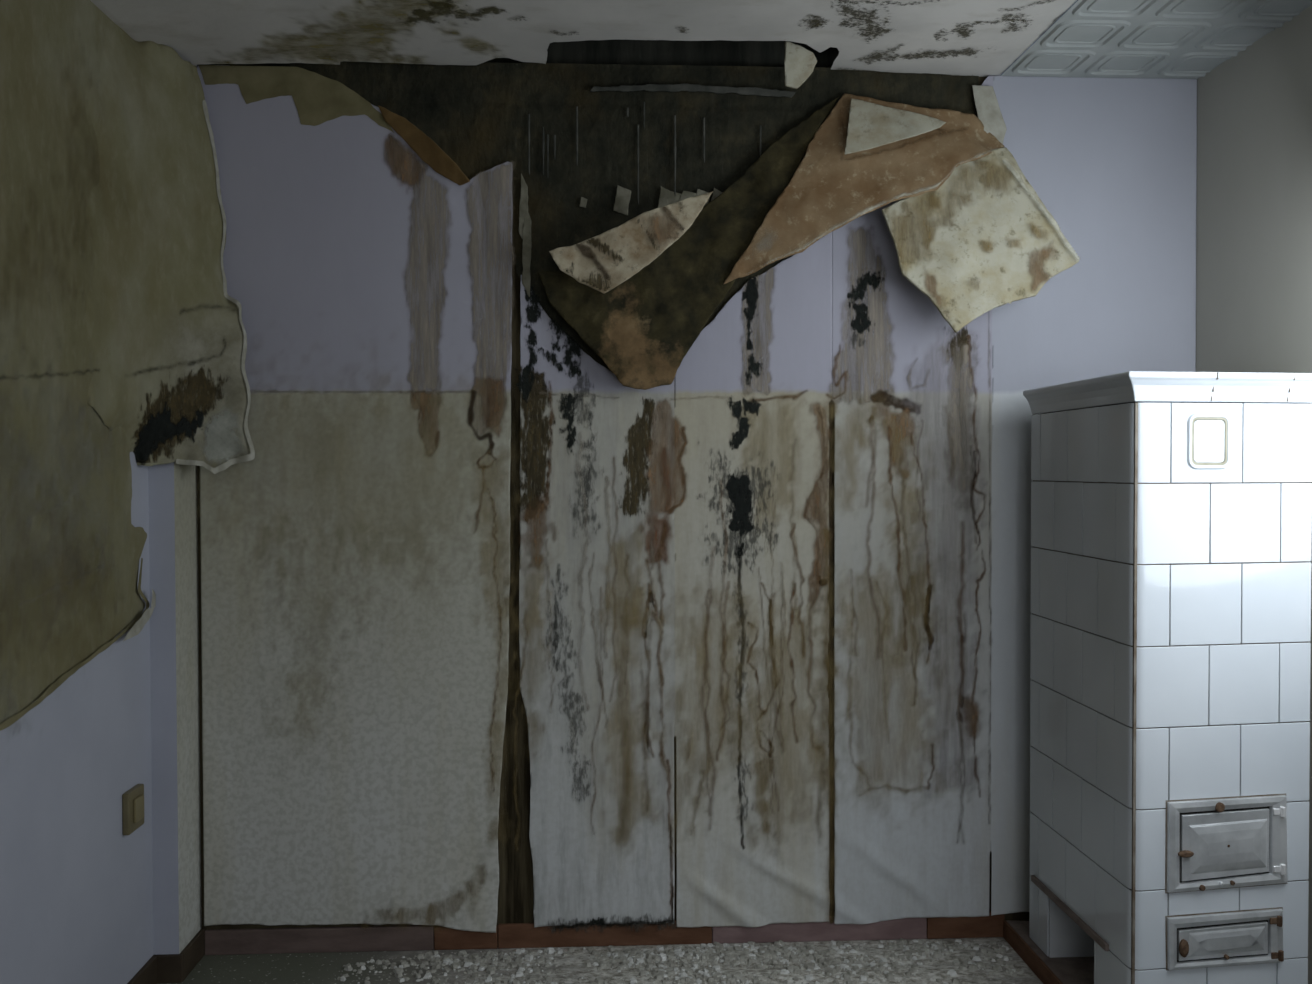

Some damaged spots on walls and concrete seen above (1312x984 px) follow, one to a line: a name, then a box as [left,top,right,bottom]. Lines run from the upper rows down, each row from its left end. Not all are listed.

leakage [224,0,525,64]
mould [799,0,1056,77]
spalling [197,61,979,373]
peeling [0,0,156,731]
leakage [707,268,805,849]
leakage [827,228,922,483]
leakage [944,325,983,546]
leakage [959,571,985,781]